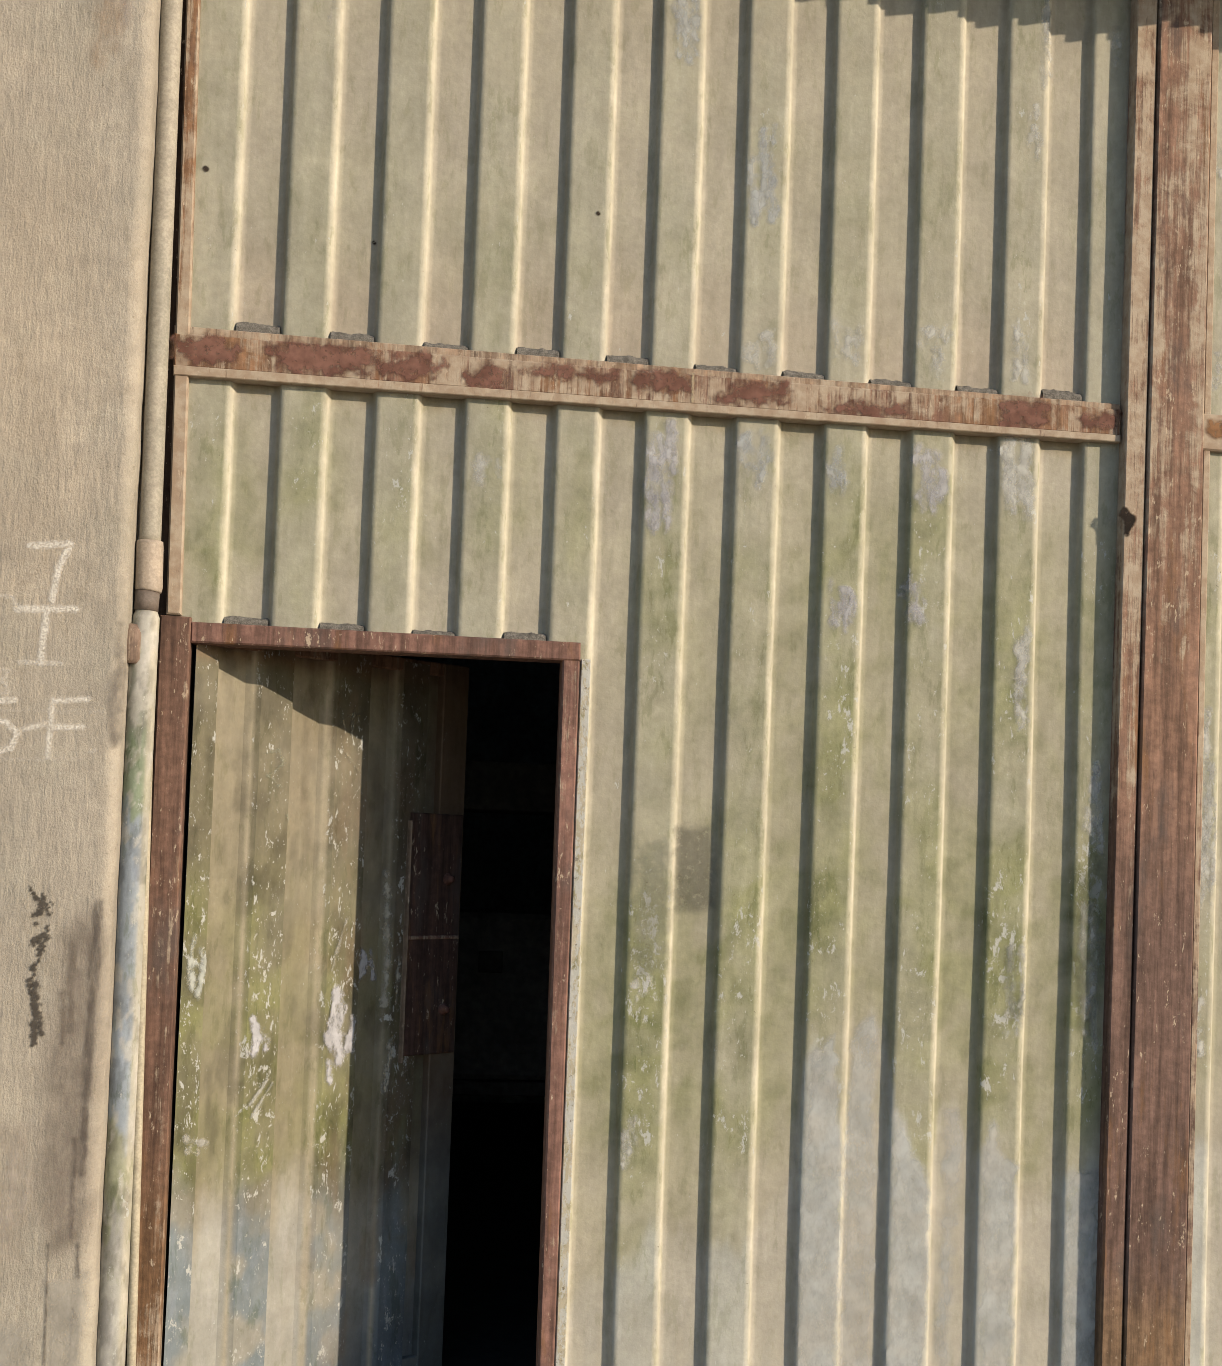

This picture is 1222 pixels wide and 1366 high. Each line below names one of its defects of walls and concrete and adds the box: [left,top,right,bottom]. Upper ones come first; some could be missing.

corrosion [265,339,509,389]
corrosion [533,363,692,396]
corrosion [716,379,790,407]
corrosion [826,400,907,418]
water stain [26,887,54,1047]
spalling [188,940,207,995]
spalling [359,873,401,1008]
spalling [250,1016,269,1057]
spalling [325,987,356,1084]
water stain [798,1041,875,1366]
water stain [886,1134,952,1366]
water stain [1064,1173,1098,1366]